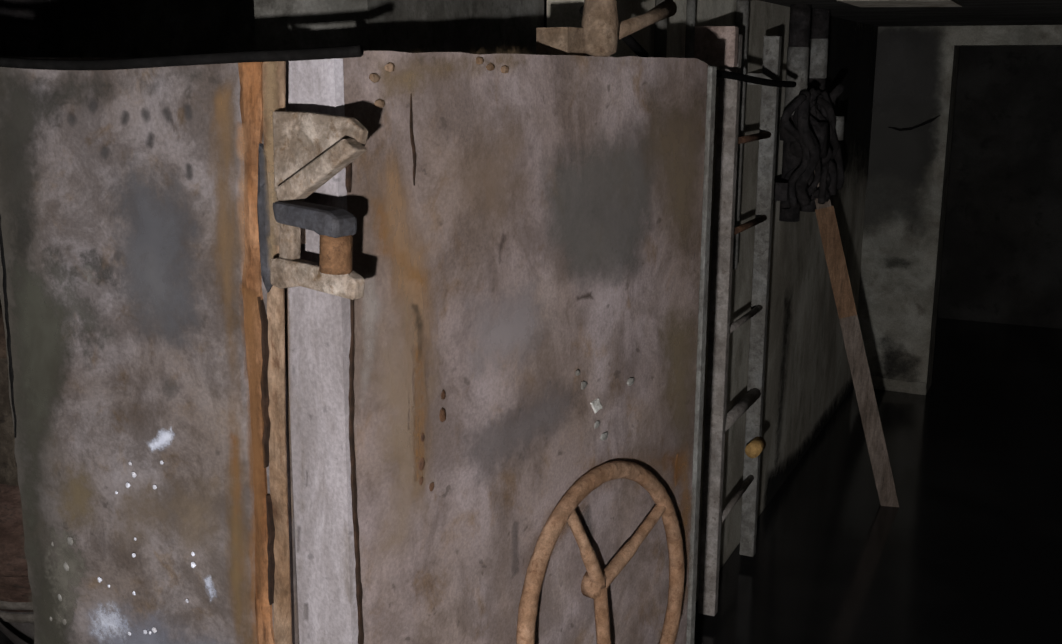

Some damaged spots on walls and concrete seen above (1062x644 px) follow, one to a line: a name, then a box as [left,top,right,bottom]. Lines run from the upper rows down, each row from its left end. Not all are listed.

rust [265,62,277,208]
damp [551,100,702,276]
damp [16,173,196,530]
rust [241,288,262,569]
damp [29,545,70,644]
damp [94,610,167,644]